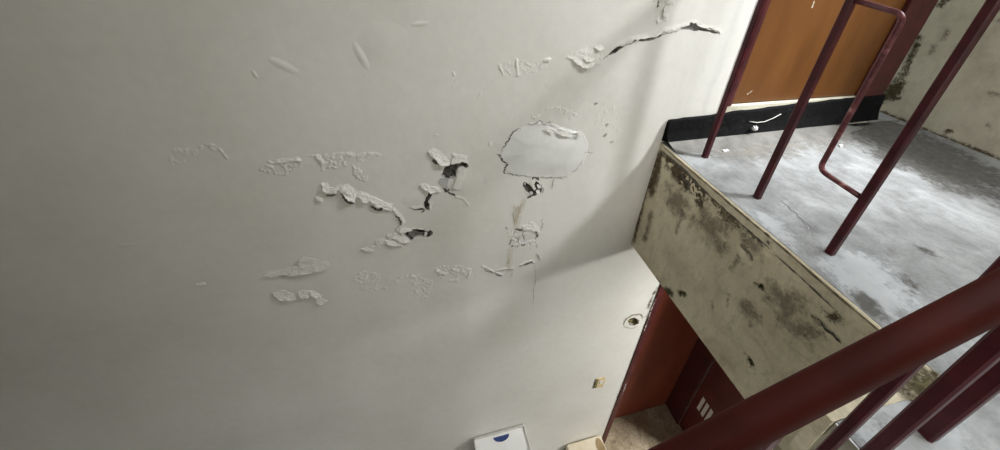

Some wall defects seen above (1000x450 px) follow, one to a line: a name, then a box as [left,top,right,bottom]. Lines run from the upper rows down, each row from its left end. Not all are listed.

crack [602,20,723,60]
flaking render [316,147,484,252]
flaking render [523,177,544,199]
water stain [632,145,799,266]
flaking render [505,213,543,250]
peeling [271,290,328,305]
spalling [623,288,658,330]
water stain [766,286,819,339]
water stain [815,249,919,323]